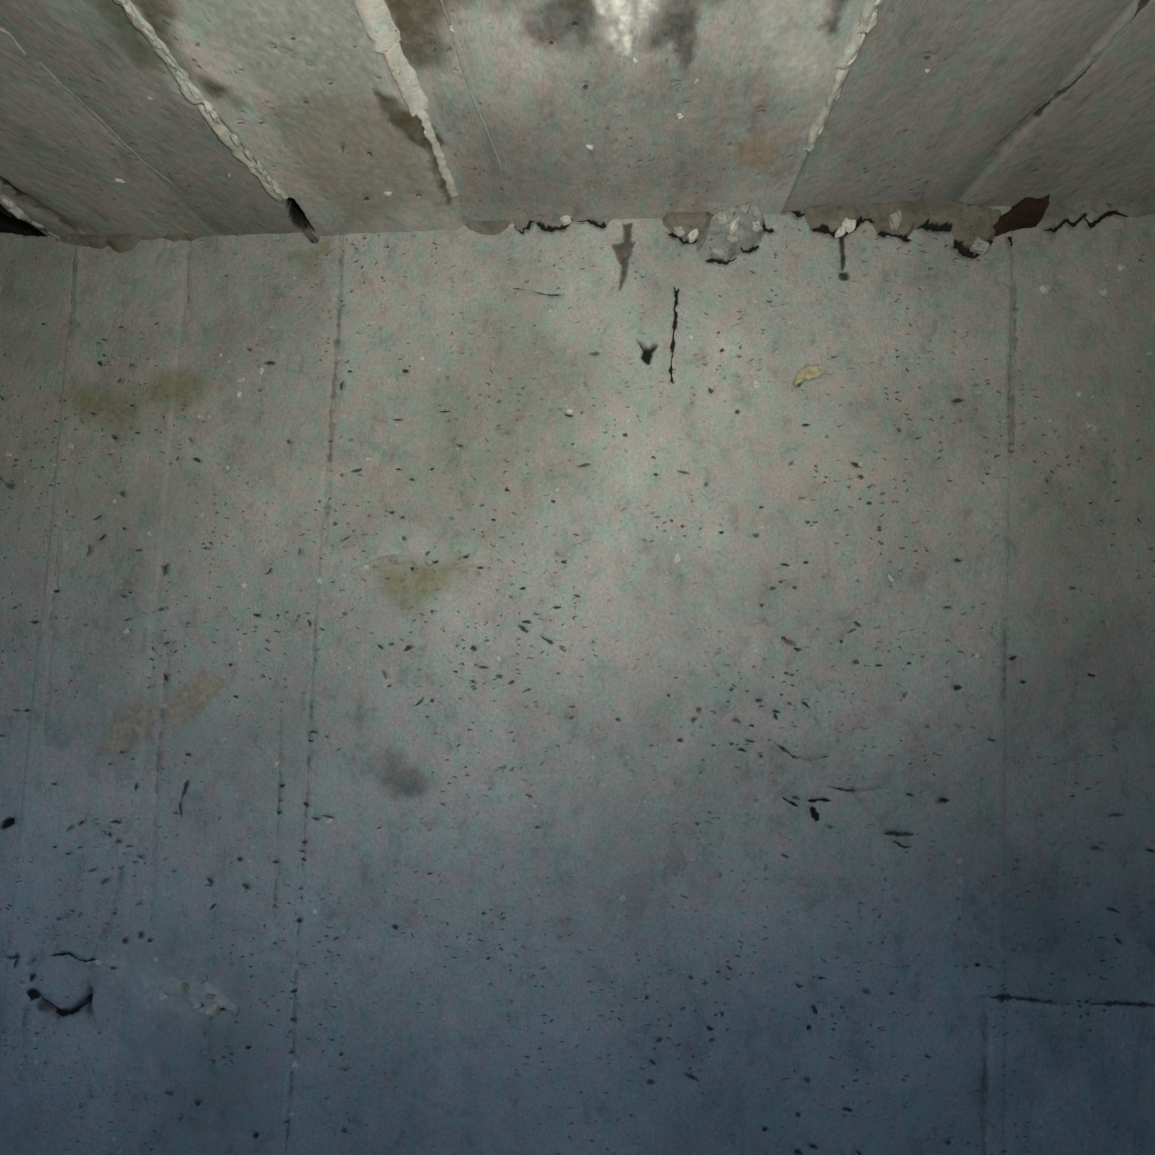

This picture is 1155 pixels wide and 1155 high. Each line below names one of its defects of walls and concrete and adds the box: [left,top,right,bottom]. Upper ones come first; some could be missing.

leakage [386,0,444,64]
leakage [540,0,694,62]
spalling [662,211,763,259]
crack [669,210,1013,265]
peeling [835,218,856,238]
peeling [888,208,902,230]
peeling [969,236,990,255]
crack [1043,211,1128,232]
crack [669,287,679,383]
crack [9,953,95,1017]